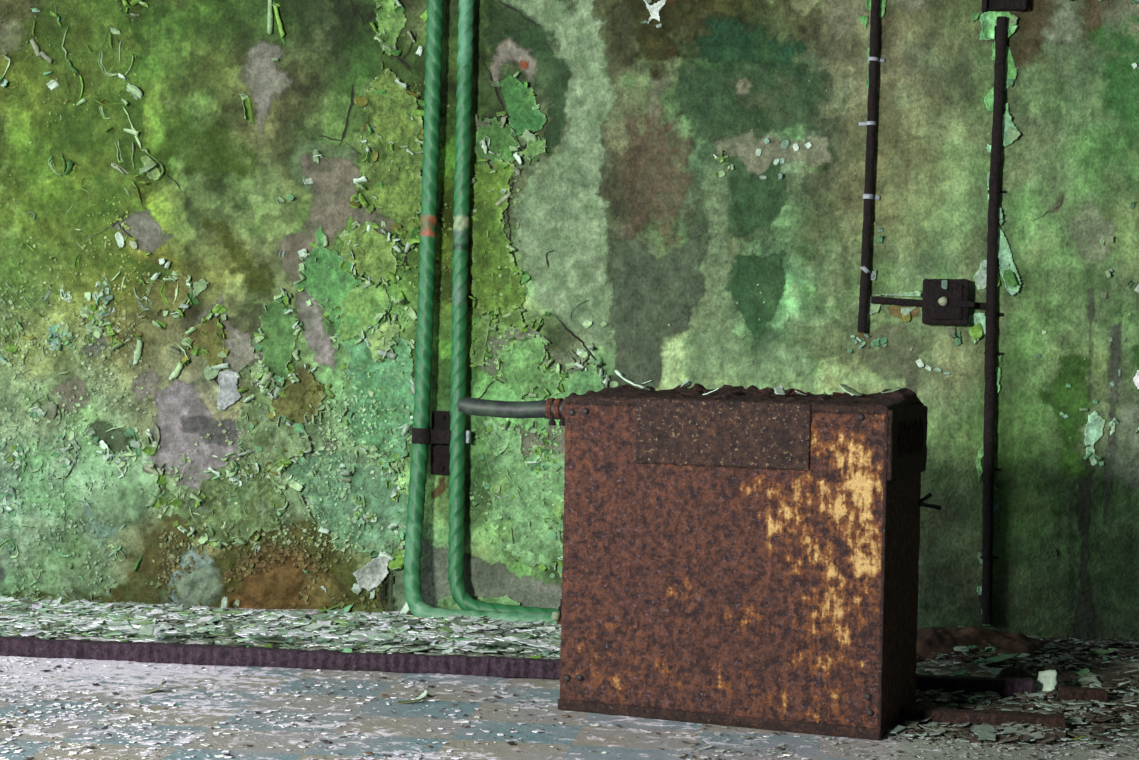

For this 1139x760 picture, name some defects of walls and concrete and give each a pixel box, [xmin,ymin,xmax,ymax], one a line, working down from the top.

peeling [1007,127,1021,141]
peeling [467,39,619,401]
peeling [0,0,427,596]
peeling [980,260,1025,303]
peeling [463,417,565,609]
peeling [221,596,240,610]
peeling [351,583,375,599]
spalling [421,540,461,609]